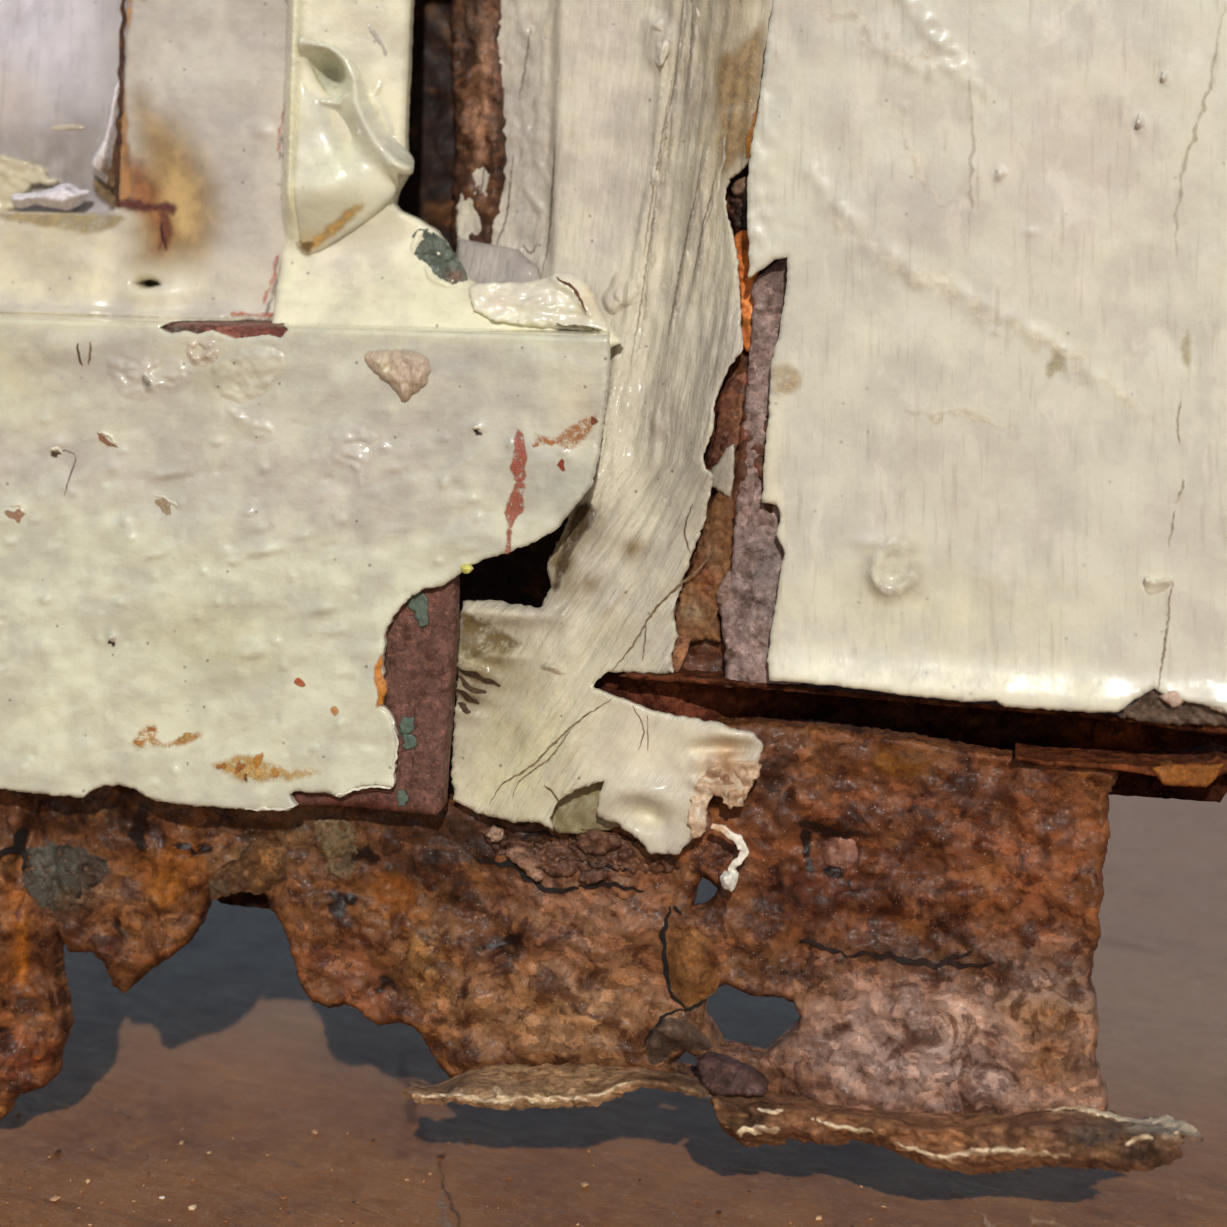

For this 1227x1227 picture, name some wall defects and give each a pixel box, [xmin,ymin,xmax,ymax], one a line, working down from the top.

rust [449,0,507,254]
peeling [0,154,60,210]
rust [118,98,210,257]
peeling [162,320,288,338]
rust [653,32,780,689]
crack [1175,400,1183,442]
spalling [5,502,26,522]
rust [505,416,598,553]
crack [1168,479,1184,546]
crack [1144,576,1174,690]
rust [217,753,311,781]
spalling [336,706,399,797]